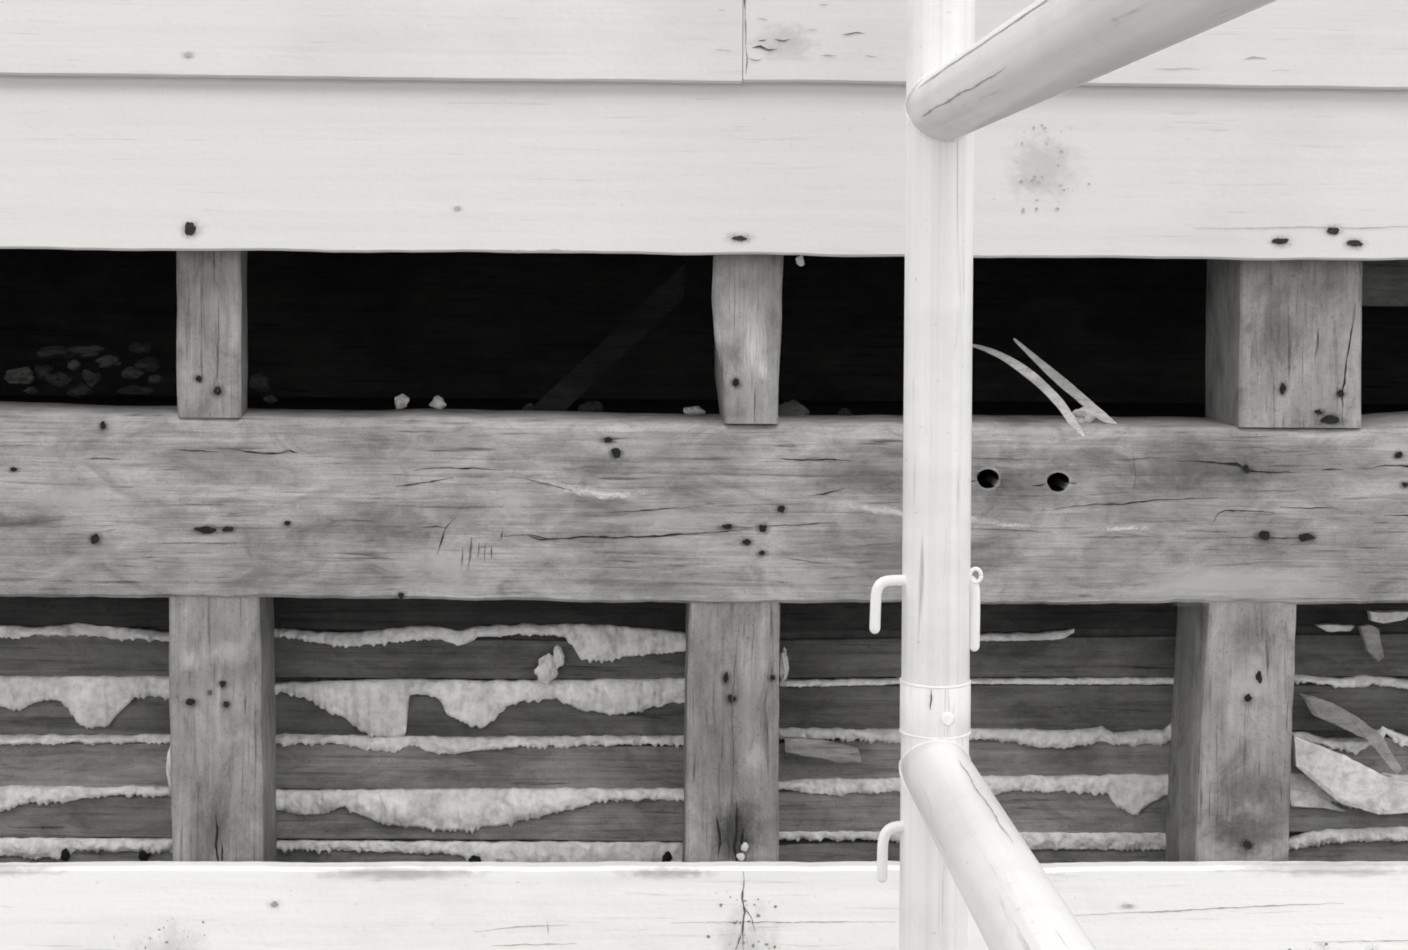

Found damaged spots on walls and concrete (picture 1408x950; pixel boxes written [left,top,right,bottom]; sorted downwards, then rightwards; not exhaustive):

crack [742,0,750,69]
crack [680,627,887,950]